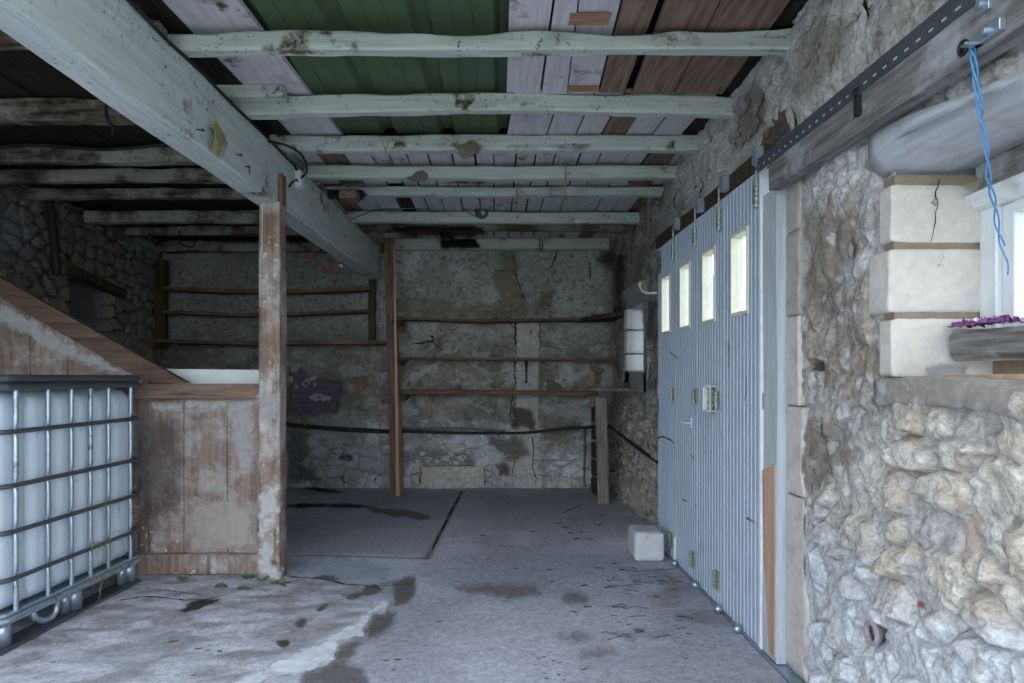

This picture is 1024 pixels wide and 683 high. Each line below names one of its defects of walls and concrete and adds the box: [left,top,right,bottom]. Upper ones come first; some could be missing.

crack [931,179,940,240]
water stain [286,364,343,416]
crack [409,251,576,486]
water stain [489,407,579,476]
water stain [231,577,415,683]